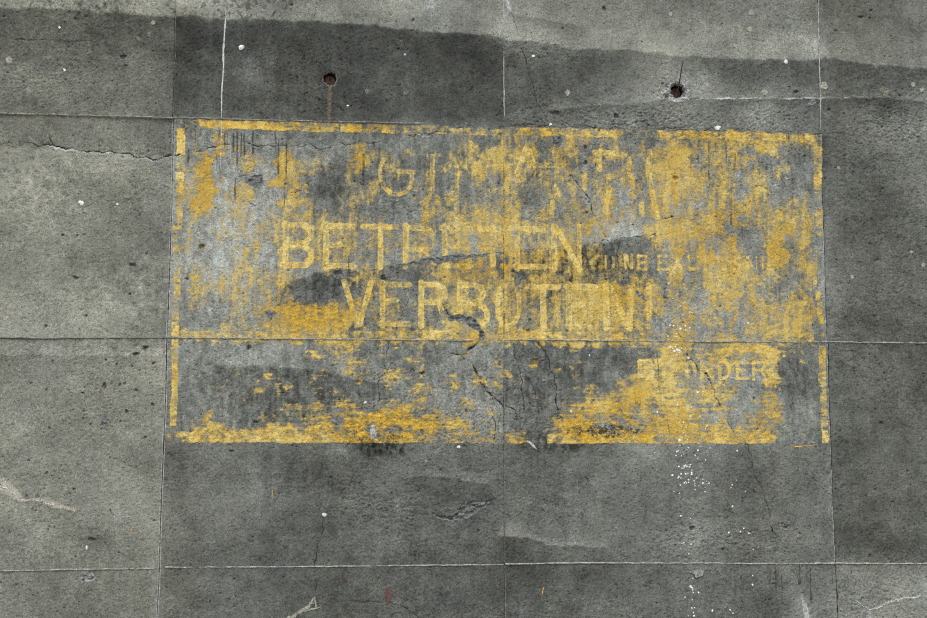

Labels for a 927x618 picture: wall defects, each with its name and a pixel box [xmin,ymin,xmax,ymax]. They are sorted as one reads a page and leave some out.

crack [1,137,380,164]
spalling [246,174,264,187]
spalling [396,254,487,266]
crack [494,5,781,535]
spalling [448,314,485,341]
crack [451,342,560,449]
spalling [432,501,489,522]